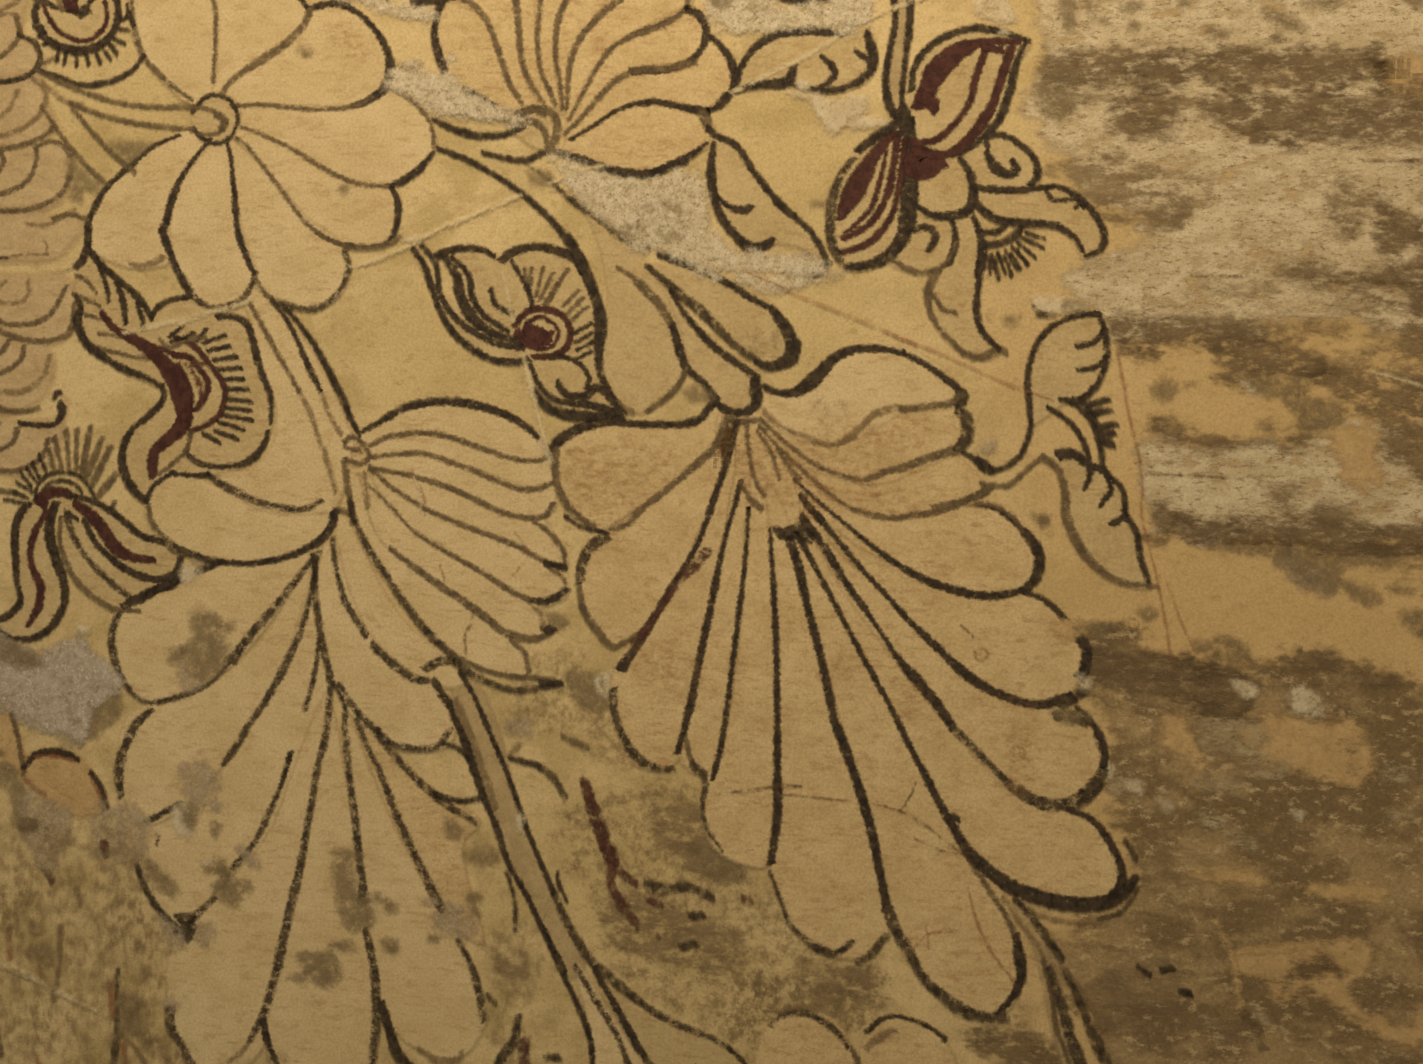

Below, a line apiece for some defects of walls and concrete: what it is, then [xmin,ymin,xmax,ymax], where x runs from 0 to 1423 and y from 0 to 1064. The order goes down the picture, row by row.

flaking render [706,0,873,34]
flaking render [530,151,826,293]
peeling [1019,0,1423,340]
peeling [1131,418,1423,549]
flaking render [0,625,122,746]
damp [507,670,613,736]
damp [1050,619,1261,726]
damp [1293,649,1397,686]
damp [0,764,176,920]
flaking render [1045,622,1423,1064]
damp [155,913,215,947]
damp [967,1026,1063,1064]